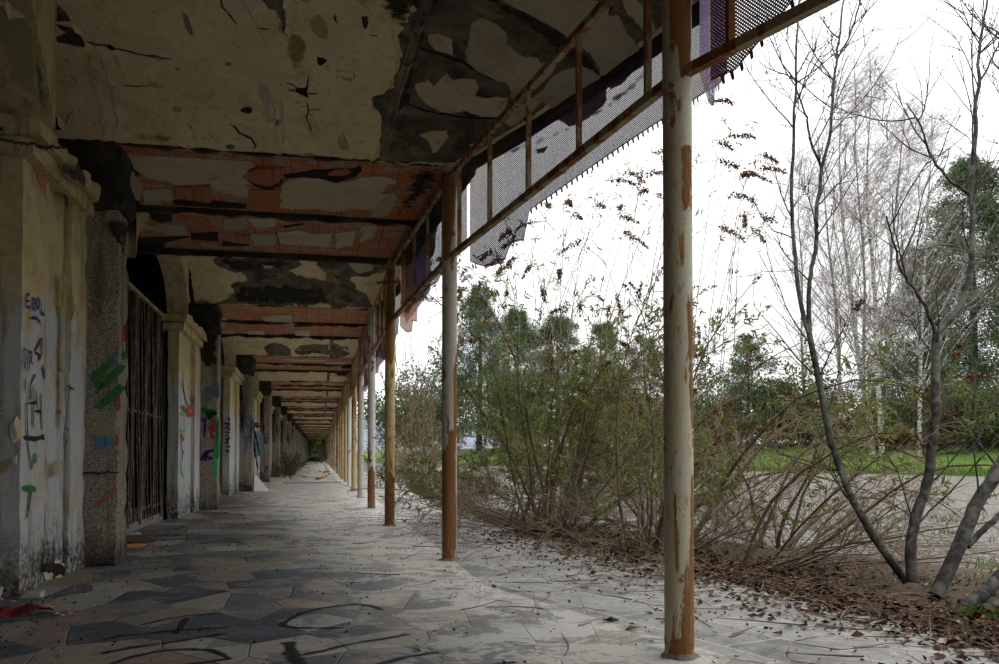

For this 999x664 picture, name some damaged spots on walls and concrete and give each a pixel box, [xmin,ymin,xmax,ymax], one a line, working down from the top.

spalling [56,4,89,49]
crack [86,41,170,62]
corrosion [669,0,691,78]
peeling [249,0,662,190]
crack [230,124,257,150]
crack [281,104,439,167]
corrosion [681,145,692,210]
peeling [137,232,385,308]
peeling [264,324,351,369]
corrosion [386,269,395,366]
corrosion [442,351,457,559]
corrosion [669,476,694,656]